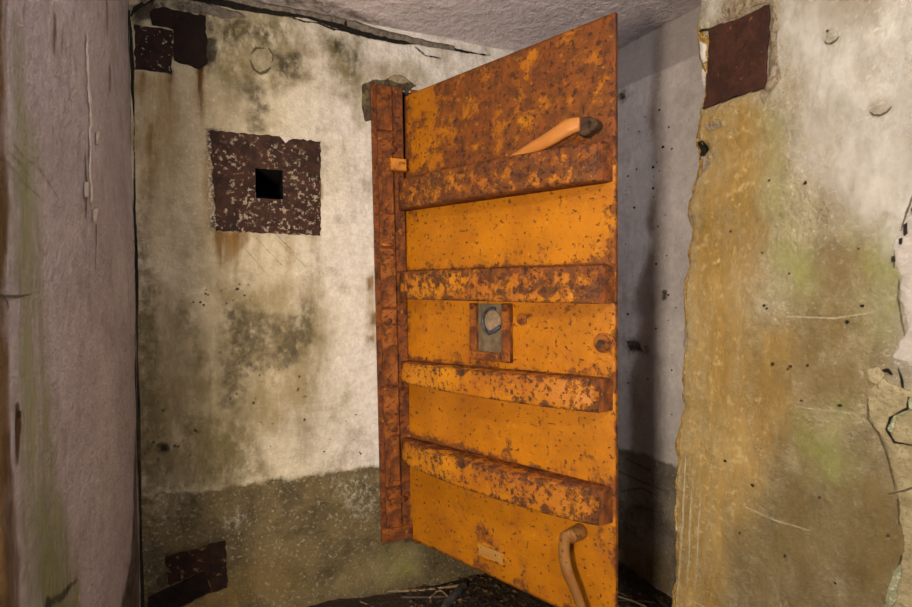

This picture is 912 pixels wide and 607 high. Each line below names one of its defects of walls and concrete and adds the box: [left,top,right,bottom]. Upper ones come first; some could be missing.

damp [206,19,301,100]
damp [327,39,358,77]
damp [122,347,251,607]
damp [223,285,323,405]
flaking render [867,197,912,607]
crack [885,397,912,446]